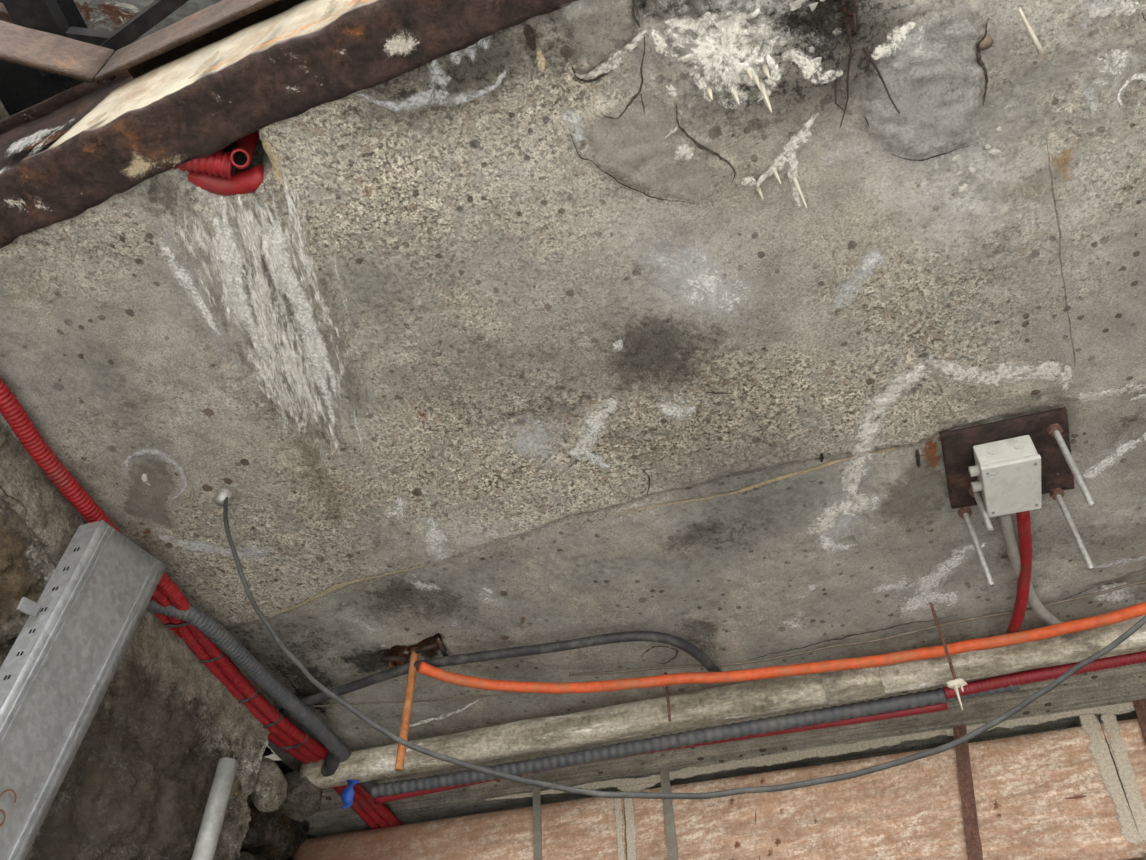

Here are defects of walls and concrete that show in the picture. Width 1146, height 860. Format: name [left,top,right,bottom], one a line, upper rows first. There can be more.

corrosion [537,50,545,72]
crack [602,0,645,119]
water stain [651,3,781,113]
spalling [701,0,896,84]
corrosion [26,129,70,150]
corrosion [258,132,283,183]
spalling [899,115,1001,196]
water stain [149,142,364,512]